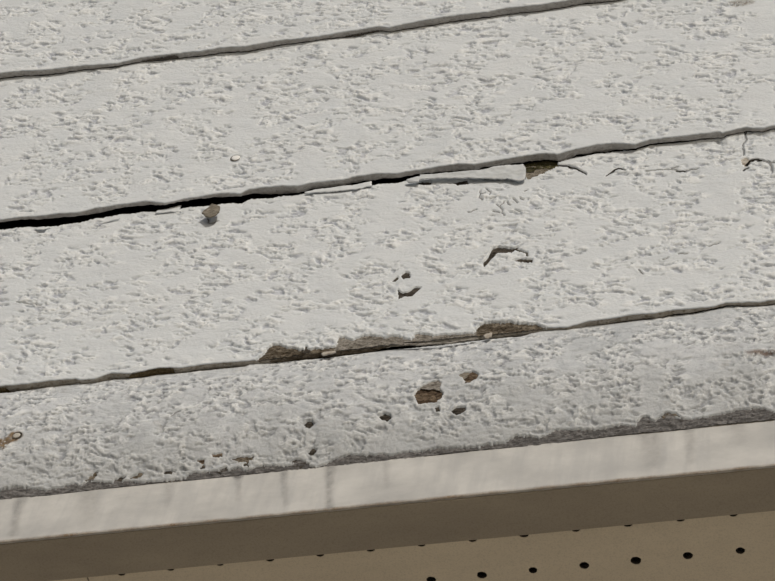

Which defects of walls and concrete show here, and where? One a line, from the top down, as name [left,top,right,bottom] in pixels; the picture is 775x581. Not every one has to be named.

crack [741,132,775,173]
crack [468,179,527,216]
crack [483,248,533,267]
peeling [257,322,545,363]
peeling [459,372,478,383]
peeling [414,381,443,412]
peeling [217,456,254,475]